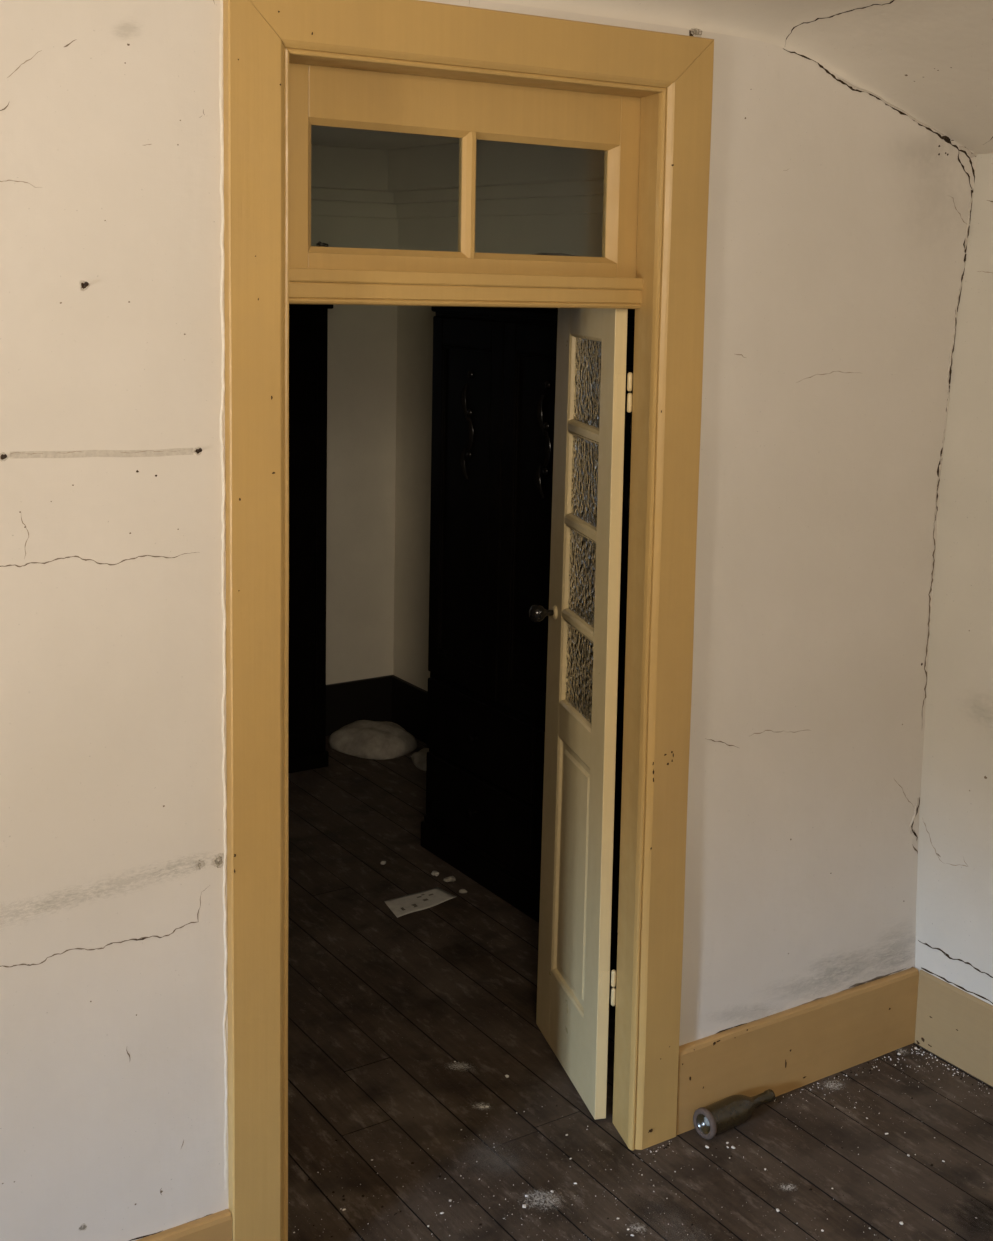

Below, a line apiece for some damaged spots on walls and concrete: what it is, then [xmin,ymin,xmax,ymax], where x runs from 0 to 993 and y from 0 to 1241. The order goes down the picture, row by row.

crack [784,0,993,709]
crack [0,517,197,567]
crack [0,886,209,967]
crack [918,940,993,978]